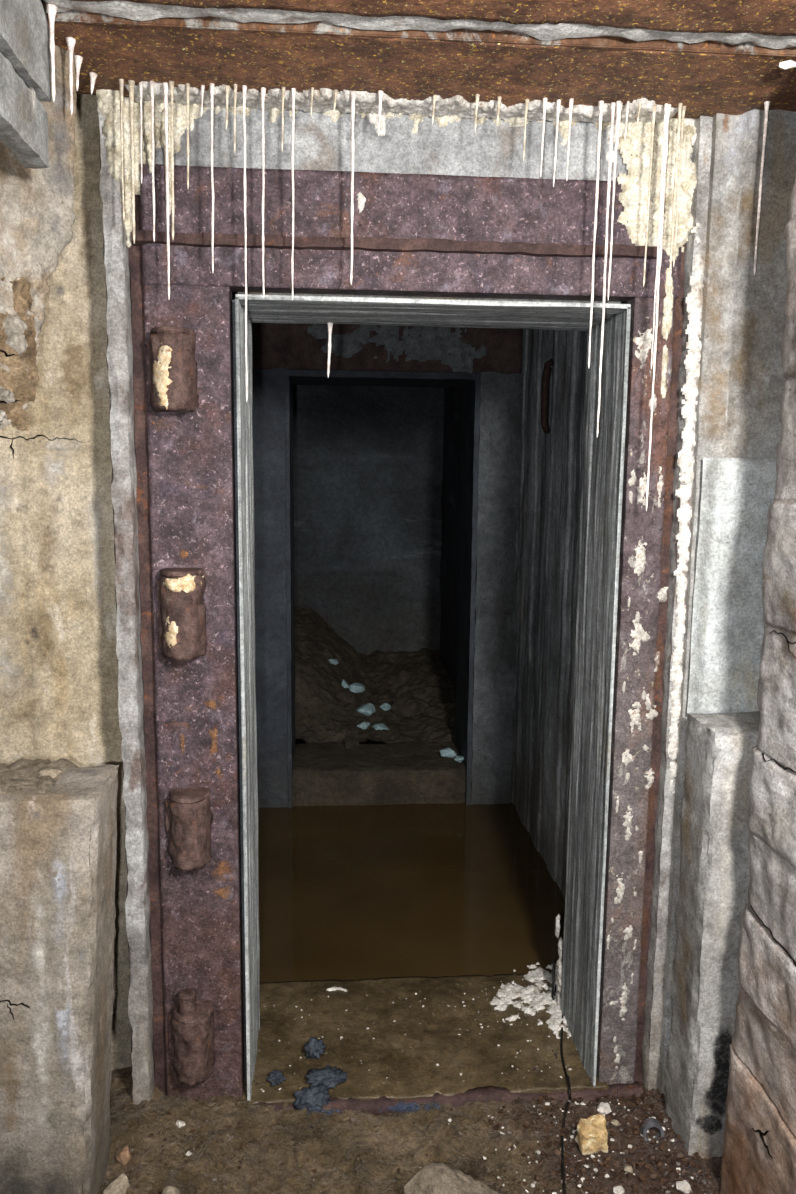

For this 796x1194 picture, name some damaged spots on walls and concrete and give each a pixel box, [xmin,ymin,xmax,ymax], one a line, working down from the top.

spalling [0,276,39,431]
water stain [62,346,86,398]
peeling [307,324,487,373]
water stain [96,81,726,843]
water stain [725,773,734,802]
crack [762,753,796,773]
crack [750,905,796,966]
water stain [485,914,571,1039]
crack [0,1000,30,1019]
water stain [696,1031,732,1134]